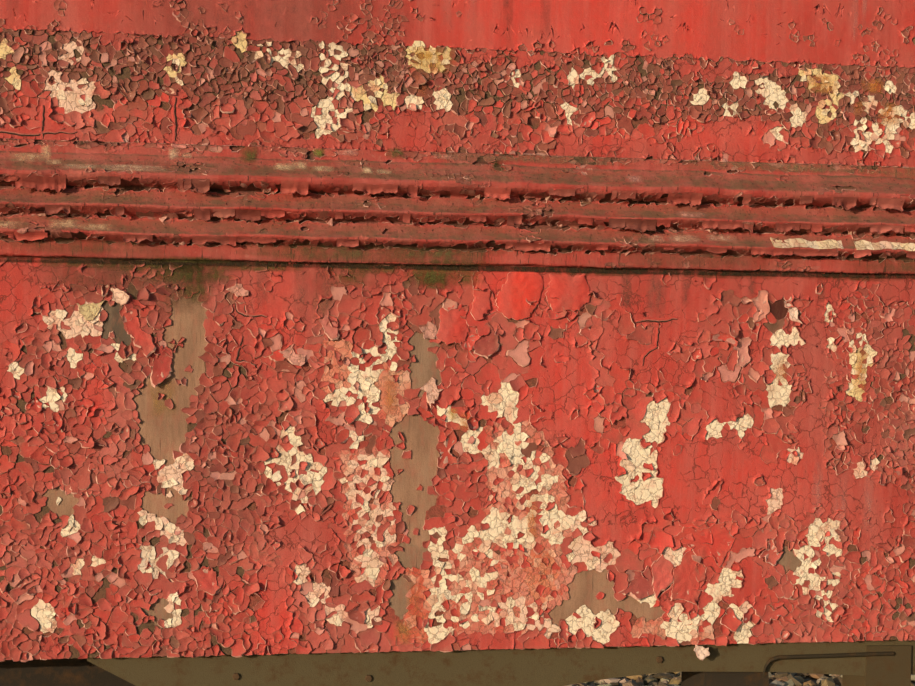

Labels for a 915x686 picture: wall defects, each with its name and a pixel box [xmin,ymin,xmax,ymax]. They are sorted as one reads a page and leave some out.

peeling [0,0,915,273]
peeling [0,259,915,662]
crack [635,316,678,366]